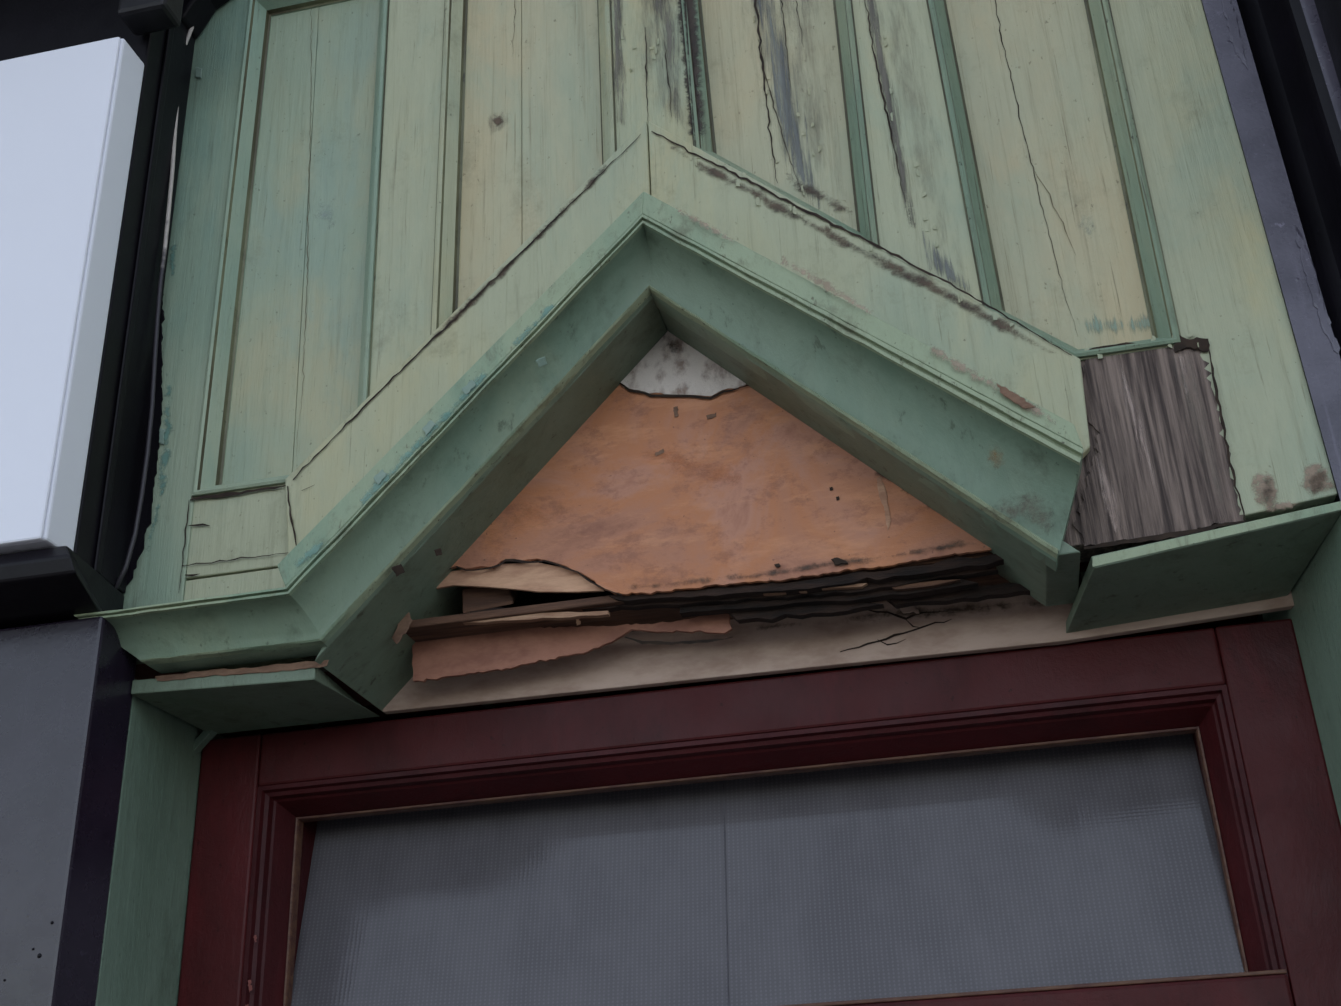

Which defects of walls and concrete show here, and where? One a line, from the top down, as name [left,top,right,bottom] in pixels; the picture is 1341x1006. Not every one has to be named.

crack [995,0,1078,336]
peeling [931,347,1053,422]
peeling [1073,332,1292,549]
peeling [1304,464,1334,492]
spalling [489,573,617,609]
peeling [392,612,733,683]
crack [840,610,952,652]